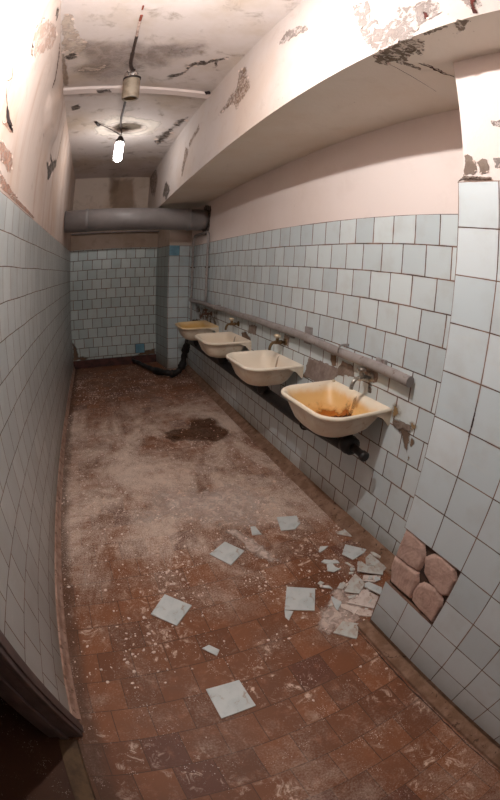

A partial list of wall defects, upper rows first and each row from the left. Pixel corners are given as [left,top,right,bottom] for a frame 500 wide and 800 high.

peeling [32,7,88,56]
peeling [280,26,308,44]
peeling [353,0,471,70]
leakage [65,46,191,75]
peeling [168,57,229,77]
flaking render [0,140,33,218]
flaking render [457,154,500,183]
peeling [304,354,354,382]
peeling [317,529,461,639]